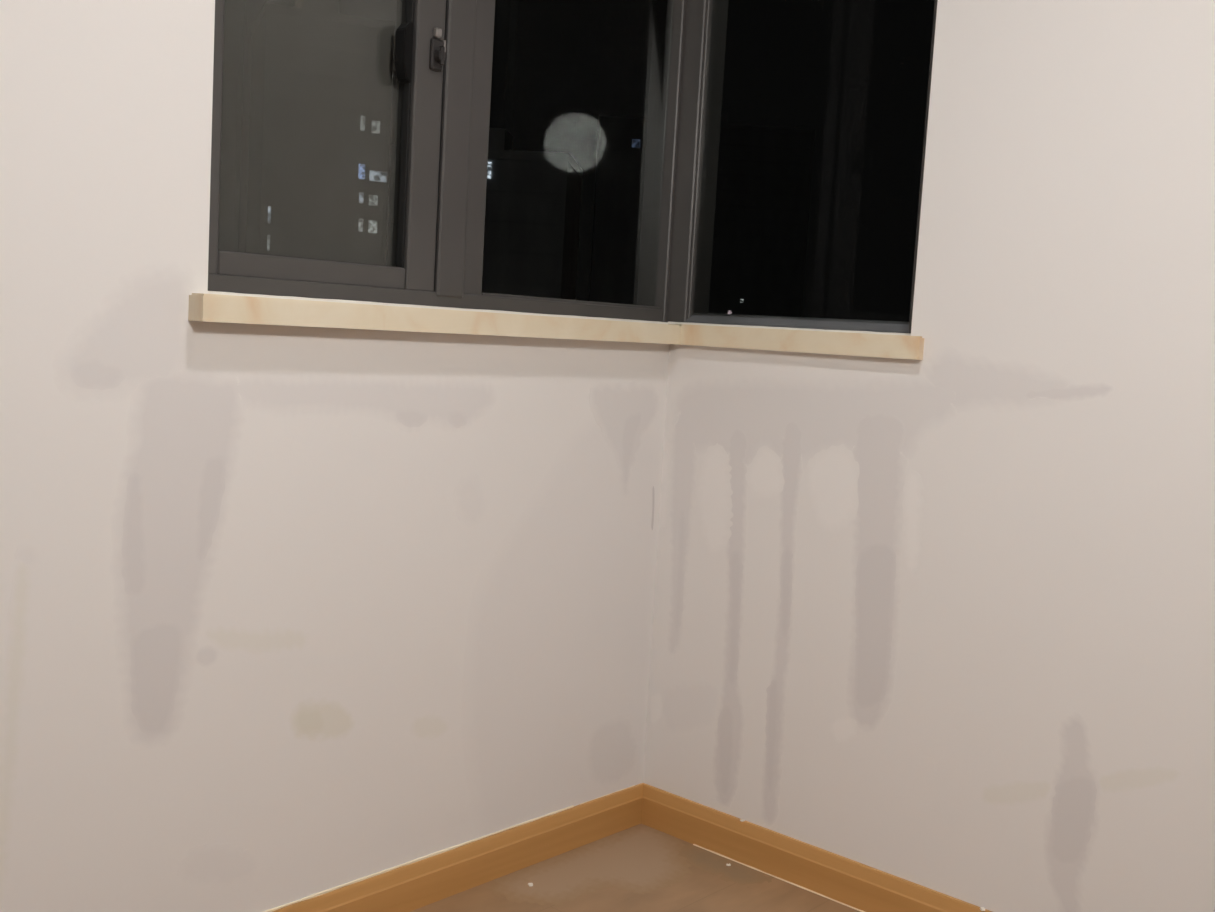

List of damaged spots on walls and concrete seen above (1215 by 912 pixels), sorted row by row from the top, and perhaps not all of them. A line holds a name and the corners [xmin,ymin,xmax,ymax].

damp [52,261,497,750]
damp [461,346,1114,836]
damp [1042,712,1182,912]